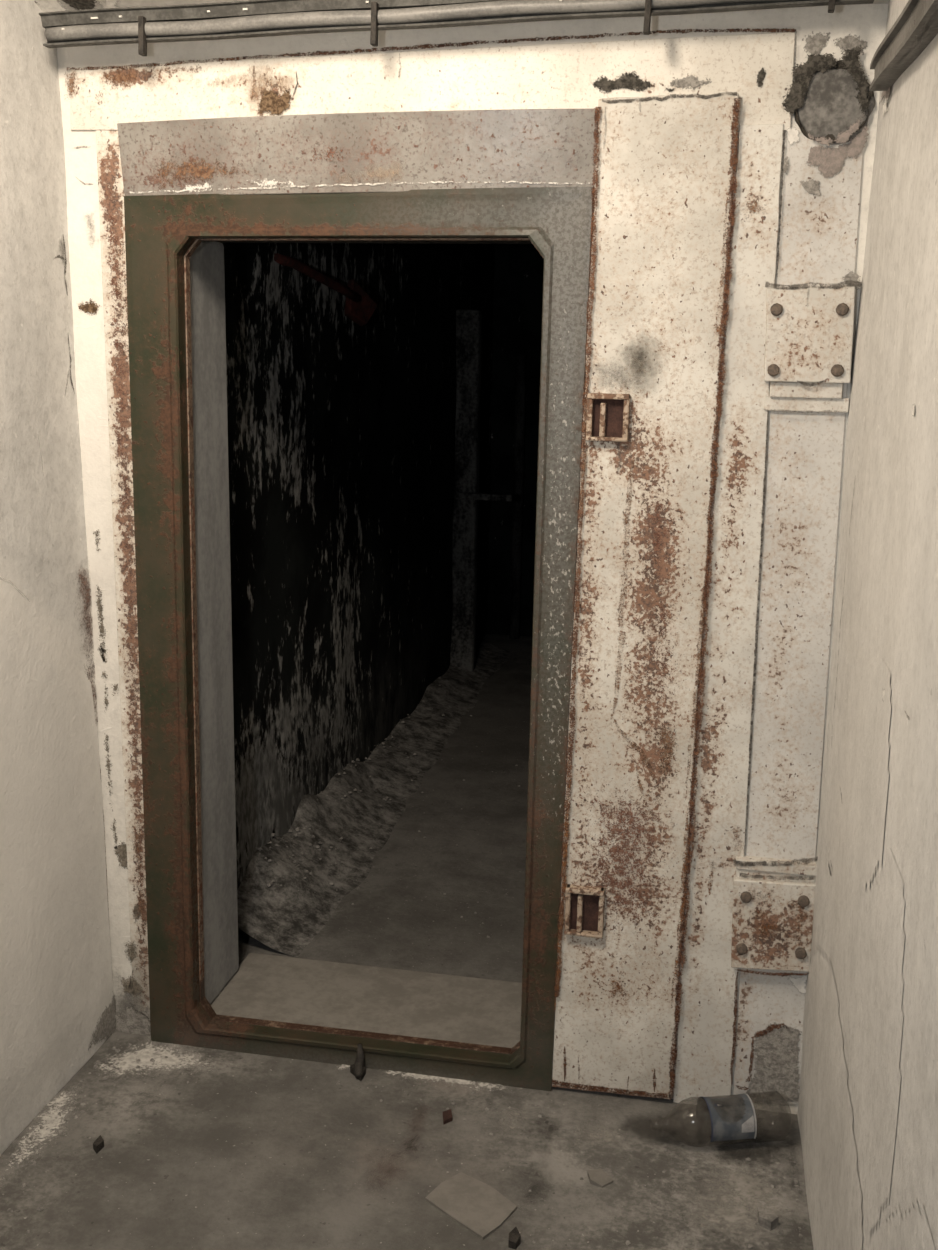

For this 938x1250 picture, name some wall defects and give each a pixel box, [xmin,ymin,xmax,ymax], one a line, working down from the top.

spalling [34,0,119,12]
rust [64,28,796,104]
spalling [782,31,891,196]
rust [776,114,793,276]
rust [79,570,98,722]
rust [98,159,147,946]
rust [552,92,768,1098]
spalling [736,1022,802,1102]